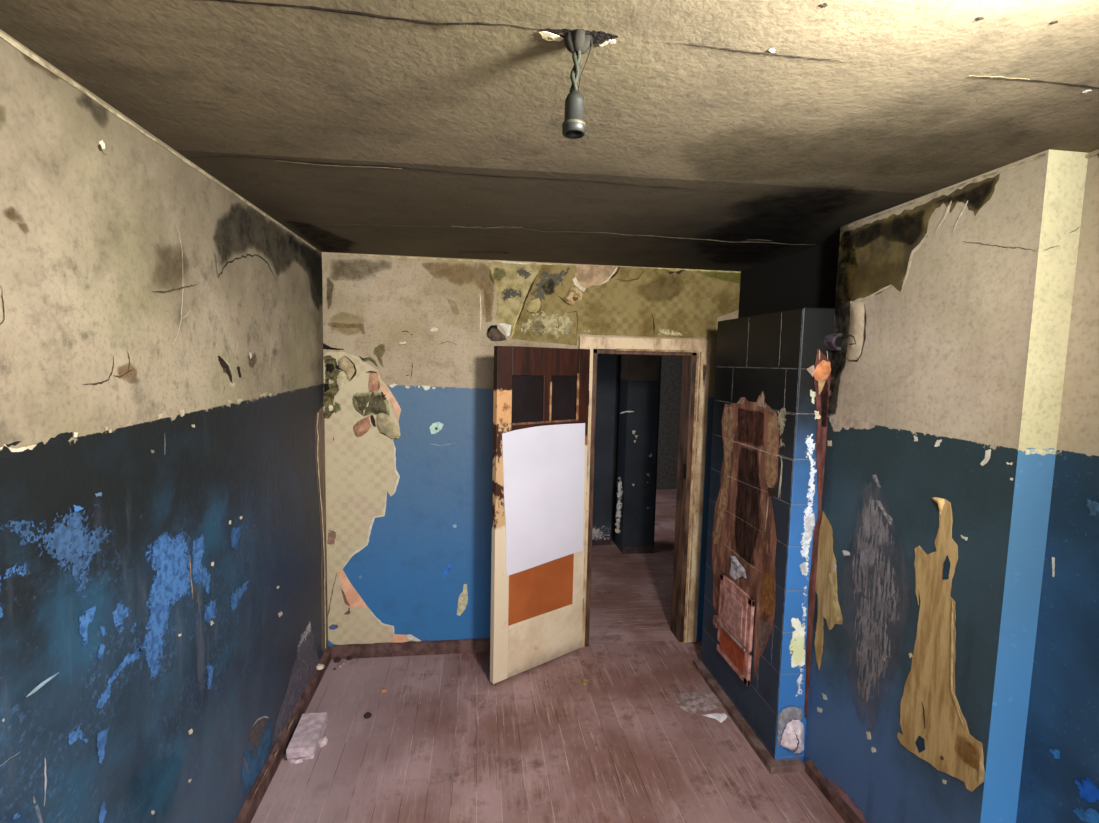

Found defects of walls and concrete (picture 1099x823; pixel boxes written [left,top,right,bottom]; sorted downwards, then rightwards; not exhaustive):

crack [211,0,538,30]
crack [671,42,851,63]
crack [971,75,1099,93]
crack [0,31,737,266]
leakage [214,205,384,309]
leakage [426,260,541,339]
peeling [838,173,1000,362]
crack [964,226,1080,251]
peeling [0,492,216,709]
peeling [315,352,436,652]
peeling [457,584,468,616]
spalling [777,349,875,754]